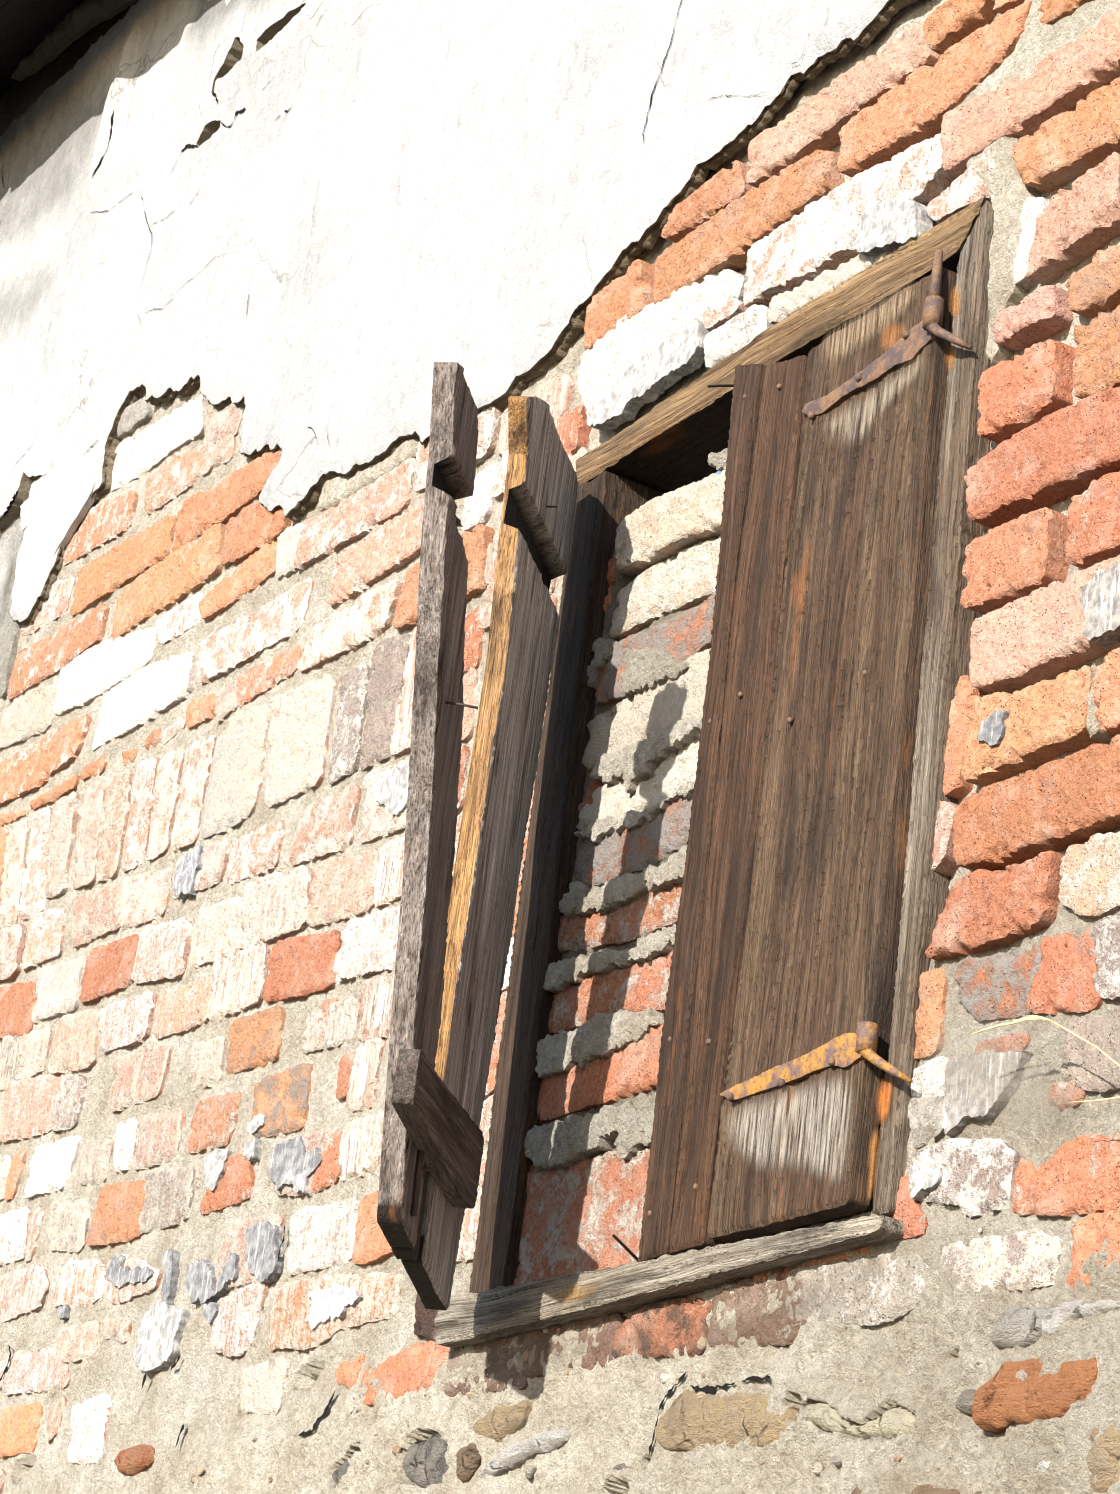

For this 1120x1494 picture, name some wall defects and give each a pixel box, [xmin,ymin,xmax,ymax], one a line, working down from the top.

crack [642,0,682,143]
flaking render [478,0,917,412]
peeling [853,197,933,257]
peeling [586,320,711,431]
flaking render [91,375,430,522]
flaking render [9,524,80,625]
peeling [1079,561,1120,649]
rust [879,1081,891,1118]
peeling [942,1049,1033,1138]
peeling [203,1113,323,1195]
peeling [106,1220,286,1374]
crack [648,1372,770,1457]